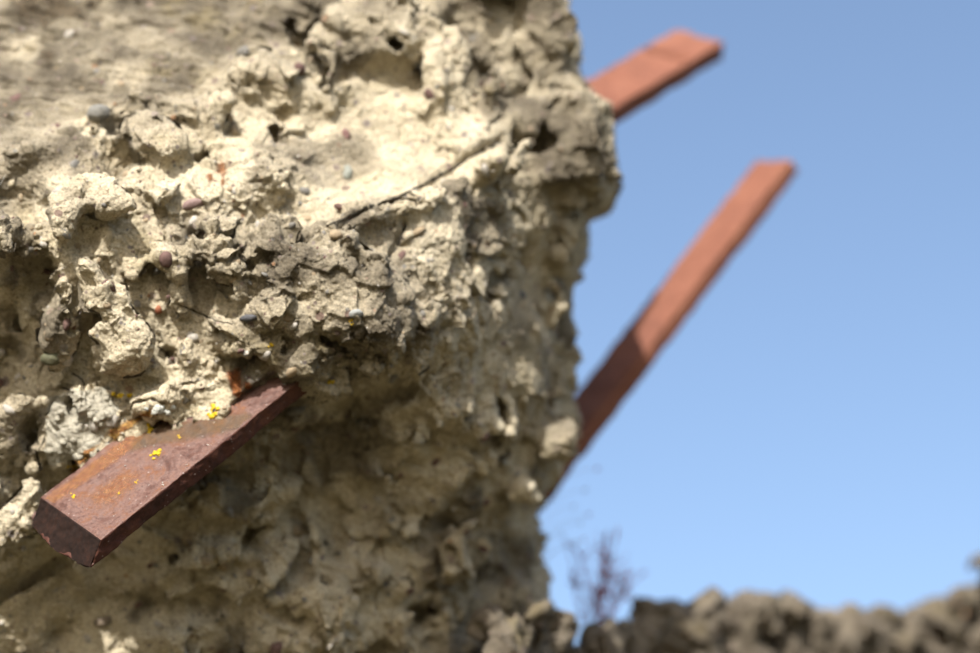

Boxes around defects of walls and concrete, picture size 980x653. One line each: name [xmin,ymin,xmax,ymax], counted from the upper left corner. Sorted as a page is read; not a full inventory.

spalling [278,6,361,94]
spalling [449,14,501,110]
spalling [103,109,149,181]
spalling [0,172,130,386]
spalling [44,384,120,467]
corrosion [70,448,95,473]
corrosion [109,409,154,441]
spalling [340,367,423,414]
spalling [55,574,164,649]